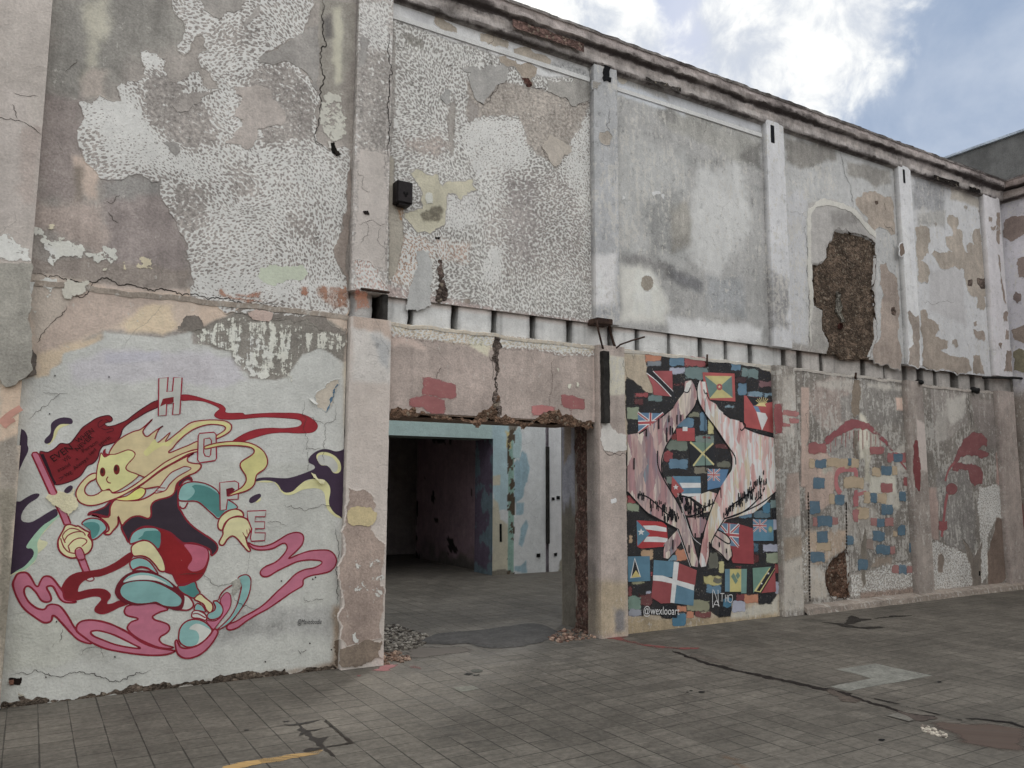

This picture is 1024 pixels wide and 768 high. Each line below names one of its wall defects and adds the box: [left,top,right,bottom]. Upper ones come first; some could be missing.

crack [314,5,328,150]
peeling [75,0,388,382]
peeling [403,168,478,239]
peeling [30,224,152,313]
crack [37,273,277,343]
flaking render [812,190,1024,376]
flaking render [390,336,627,453]
peeling [0,487,386,708]
flaking render [825,527,867,600]